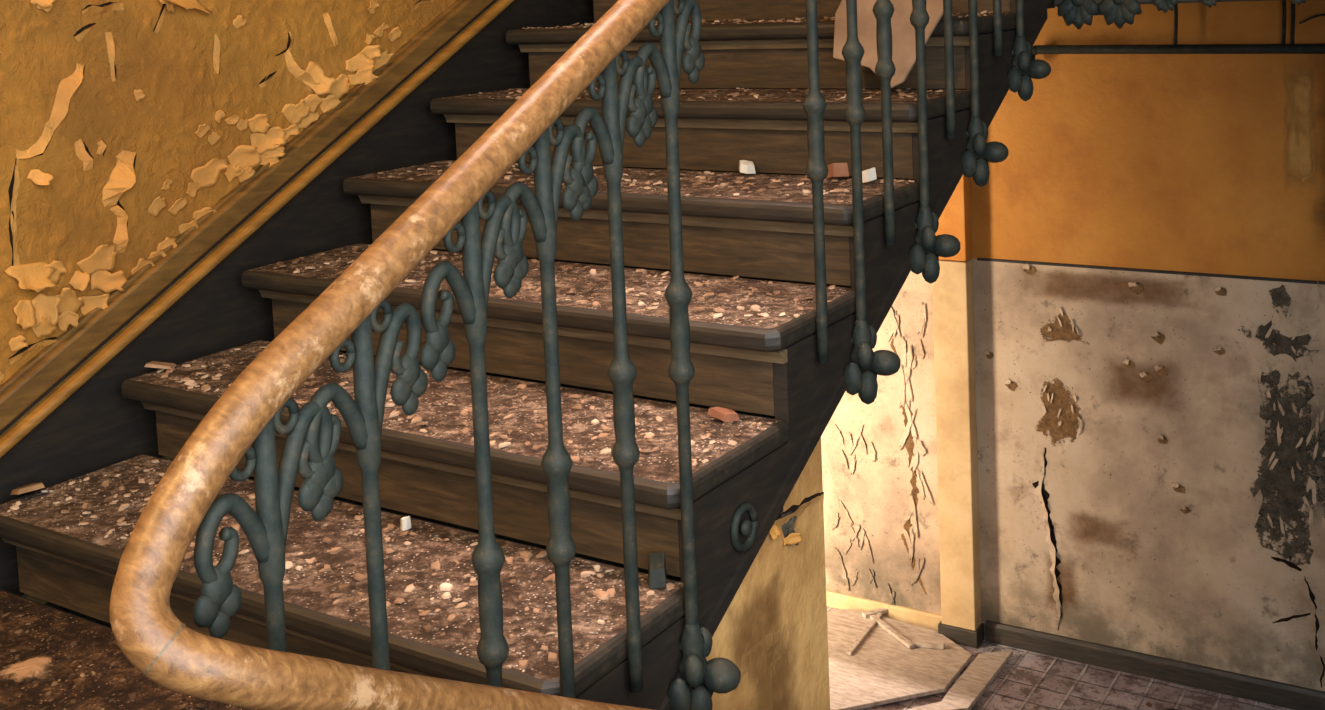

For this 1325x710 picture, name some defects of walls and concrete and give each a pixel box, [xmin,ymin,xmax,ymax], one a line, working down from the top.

peeling [5,0,402,352]
spalling [1036,377,1083,446]
spalling [1040,307,1090,344]
spalling [1238,285,1325,565]
crack [1032,447,1062,630]
crack [1271,557,1325,687]